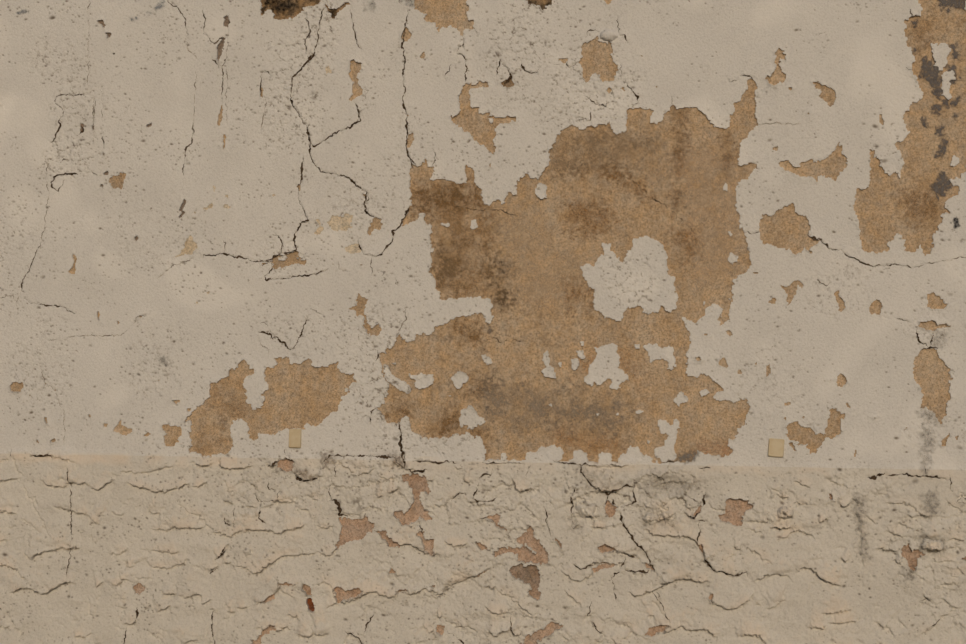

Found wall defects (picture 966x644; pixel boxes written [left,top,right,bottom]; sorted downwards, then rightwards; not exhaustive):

crack [157,0,409,284]
crack [399,0,436,166]
peeling [853,0,966,256]
peeling [377,48,792,466]
peeling [759,203,822,254]
peeling [162,356,356,457]
peeling [913,348,953,424]
crack [256,422,455,523]
flaking render [476,526,549,600]
crack [554,461,670,621]
crack [668,494,748,576]
crack [868,469,966,504]